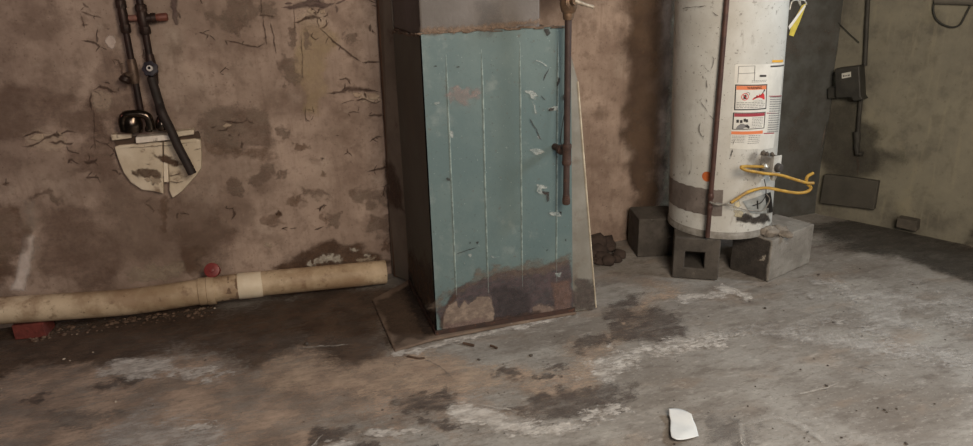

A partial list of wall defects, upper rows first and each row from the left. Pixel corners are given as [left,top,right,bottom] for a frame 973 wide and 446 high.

crack [24,3,144,181]
crack [212,120,252,148]
crack [199,0,381,142]
leakage [308,279,771,446]